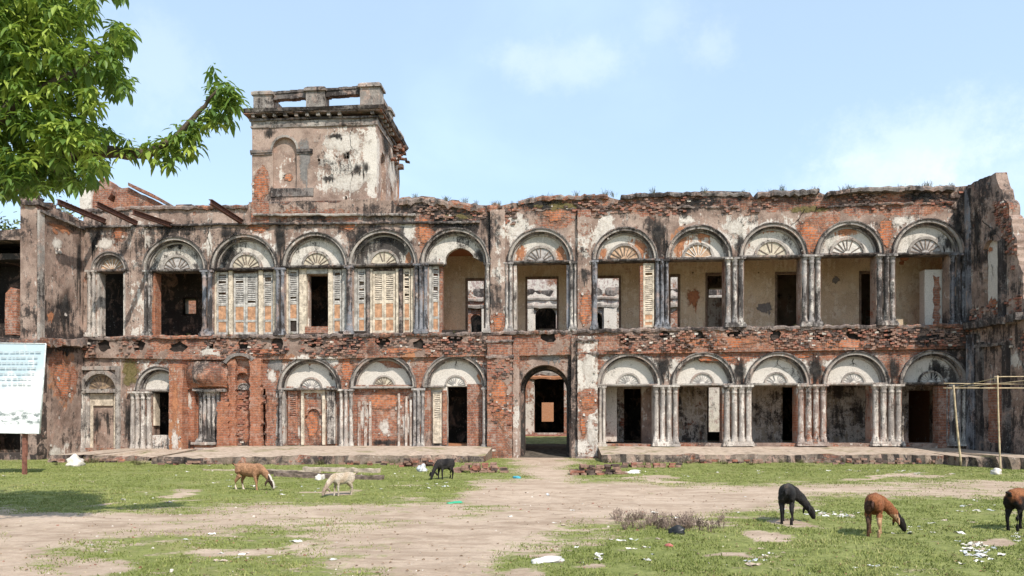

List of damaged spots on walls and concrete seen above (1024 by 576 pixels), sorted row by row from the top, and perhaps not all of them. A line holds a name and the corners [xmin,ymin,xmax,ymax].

flaking render [251,171,269,202]
flaking render [542,205,568,222]
flaking render [800,220,821,253]
flaking render [878,216,910,248]
flaking render [245,347,281,382]
flaking render [381,345,422,354]
peeling [580,354,598,446]